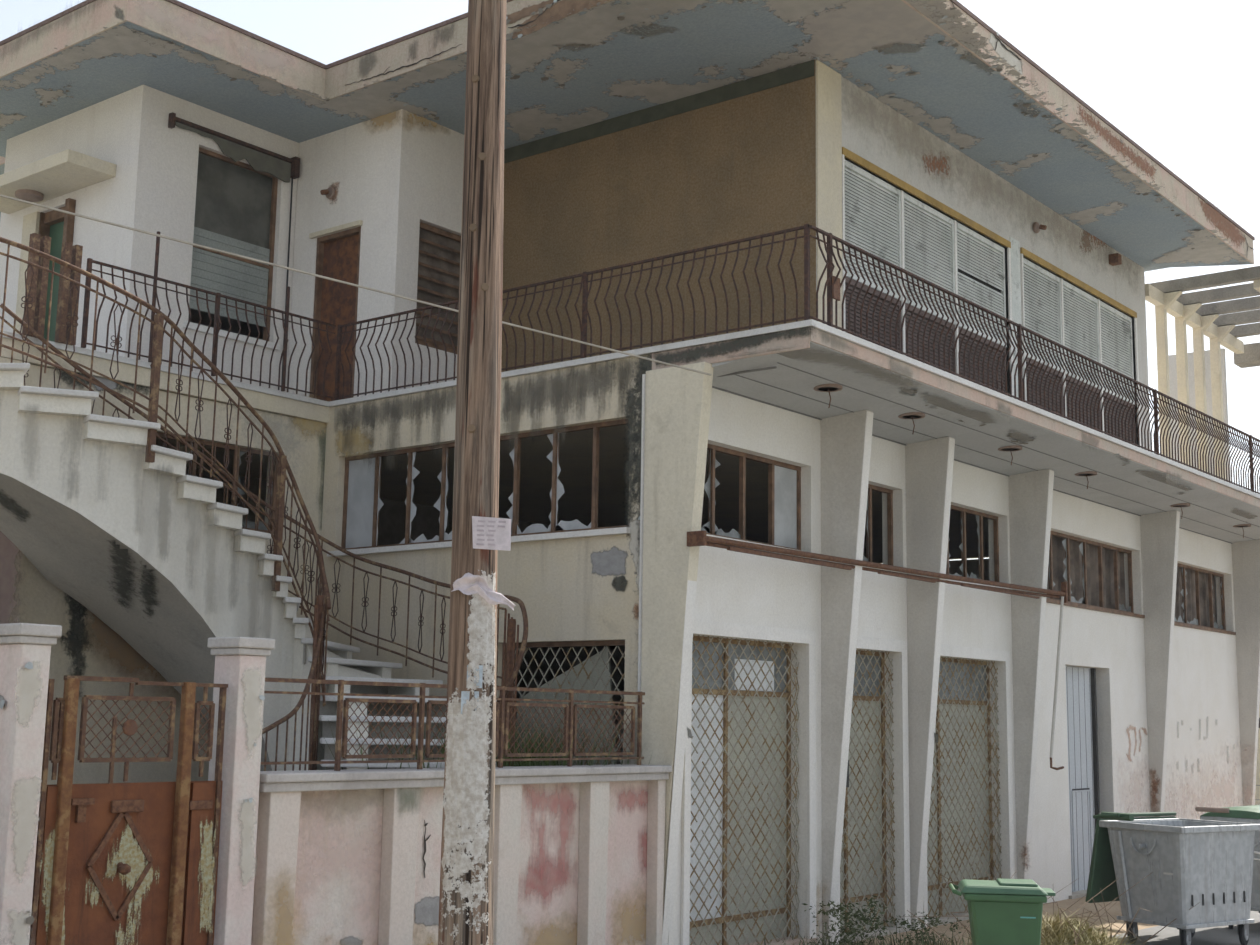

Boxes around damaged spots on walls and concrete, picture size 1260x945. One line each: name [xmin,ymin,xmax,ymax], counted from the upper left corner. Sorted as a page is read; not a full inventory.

peeling [0,6,467,121]
peeling [505,0,1249,265]
damp [109,540,157,616]
damp [61,594,178,693]